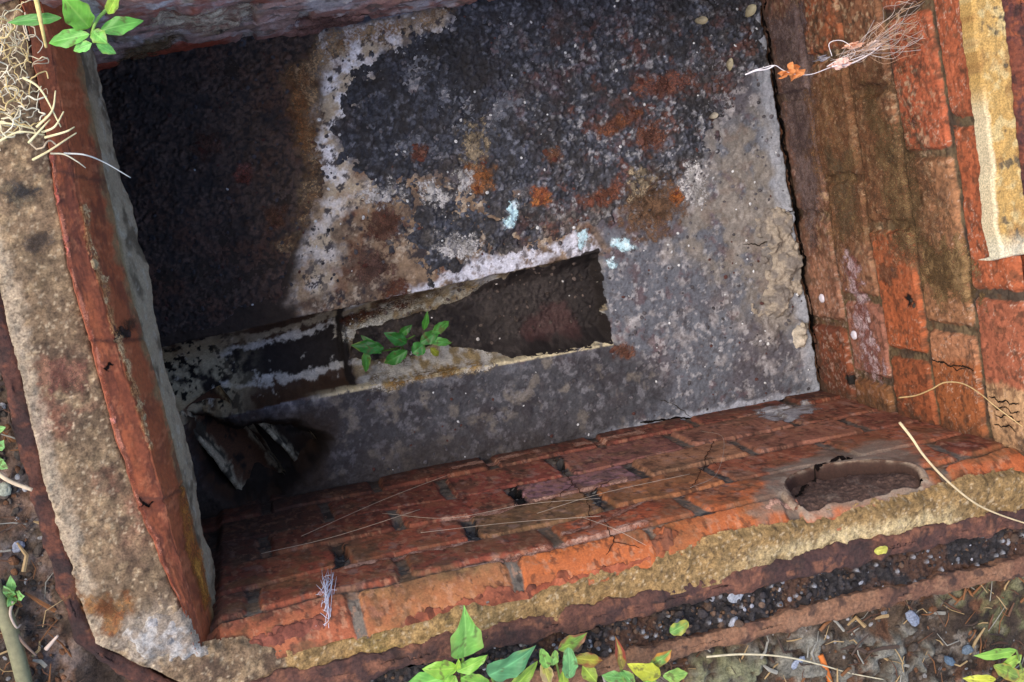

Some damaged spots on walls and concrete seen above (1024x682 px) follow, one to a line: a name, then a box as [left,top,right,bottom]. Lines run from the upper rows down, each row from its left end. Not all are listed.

leakage [275,8,447,252]
rust [578,69,700,245]
rust [463,158,497,194]
rust [529,185,552,207]
crack [932,359,974,371]
crack [989,396,1020,432]
crack [548,473,639,554]